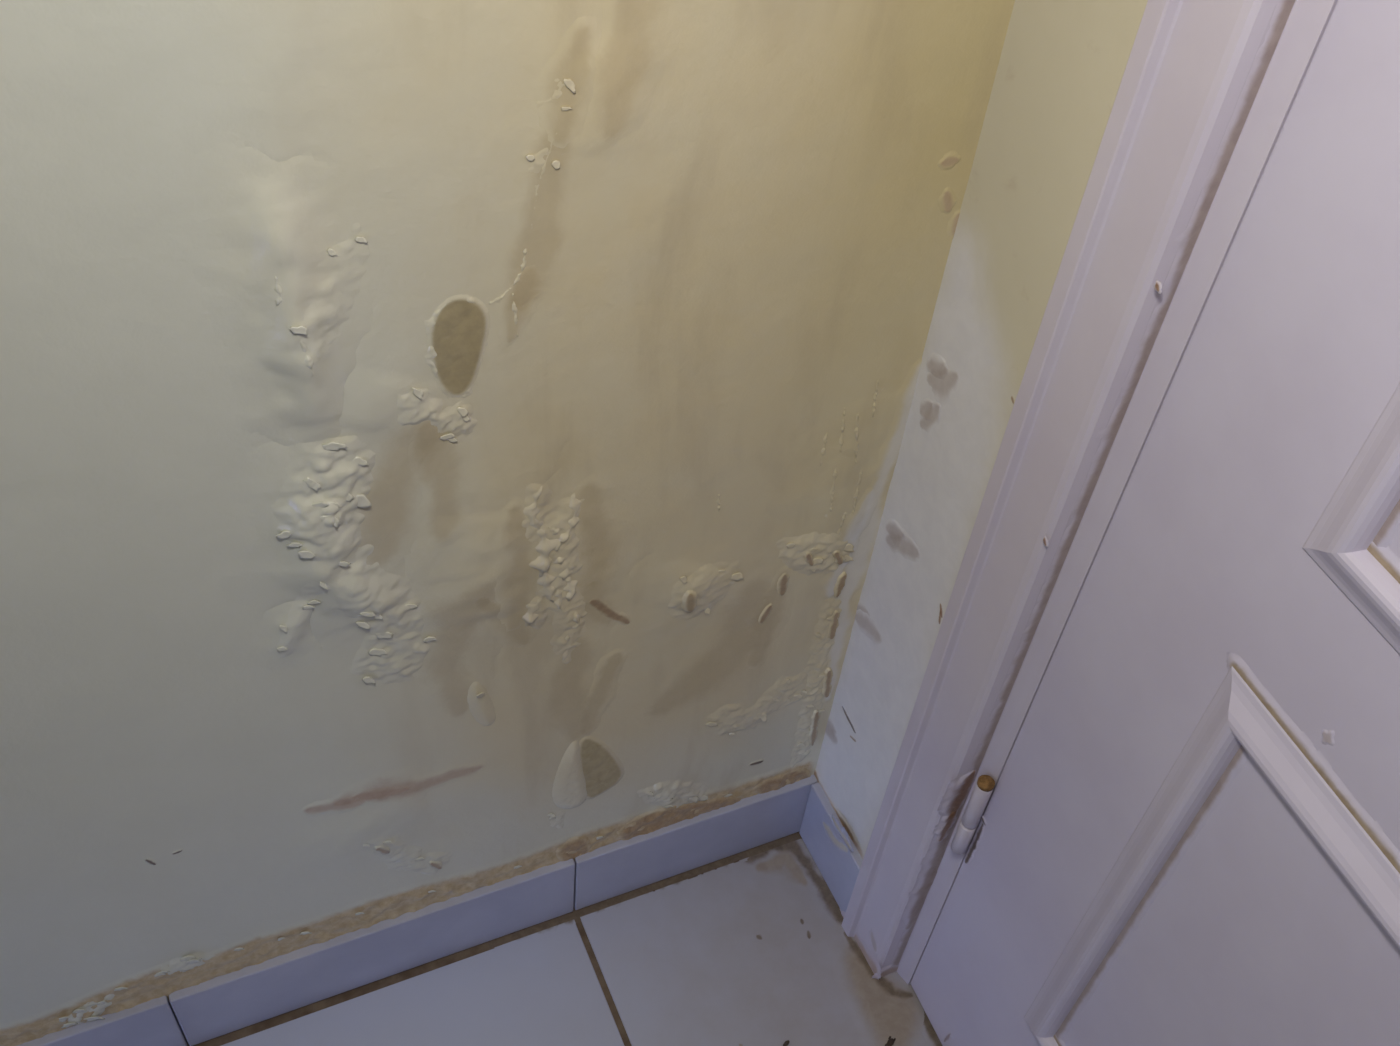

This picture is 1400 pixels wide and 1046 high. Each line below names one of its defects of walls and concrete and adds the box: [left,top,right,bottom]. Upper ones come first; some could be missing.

damp [487,0,695,347]
peeling [424,294,490,399]
corrosion [299,761,487,818]
flaking render [0,757,864,1046]
damp [330,397,540,722]
damp [531,474,633,746]
peeling [552,736,625,809]
damp [640,561,796,722]
damp [813,180,1031,856]
damp [900,804,963,930]